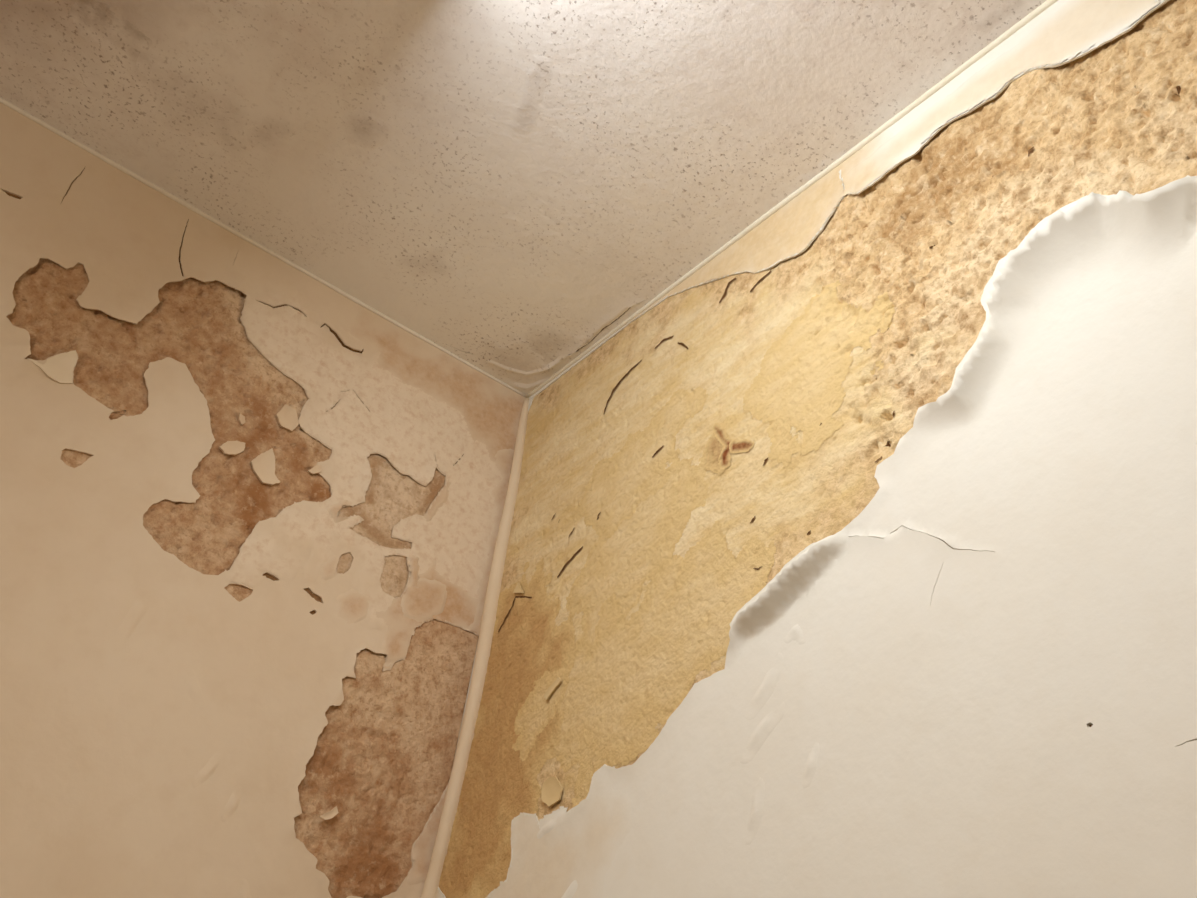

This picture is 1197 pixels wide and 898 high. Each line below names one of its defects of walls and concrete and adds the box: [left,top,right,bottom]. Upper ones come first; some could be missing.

crack [179,222,188,276]
flaking render [528,0,1197,411]
flaking render [6,258,332,602]
crack [265,304,363,354]
crack [604,335,688,414]
damp [224,0,1163,898]
peeling [336,453,446,598]
crack [557,546,583,578]
flaking render [294,619,479,898]